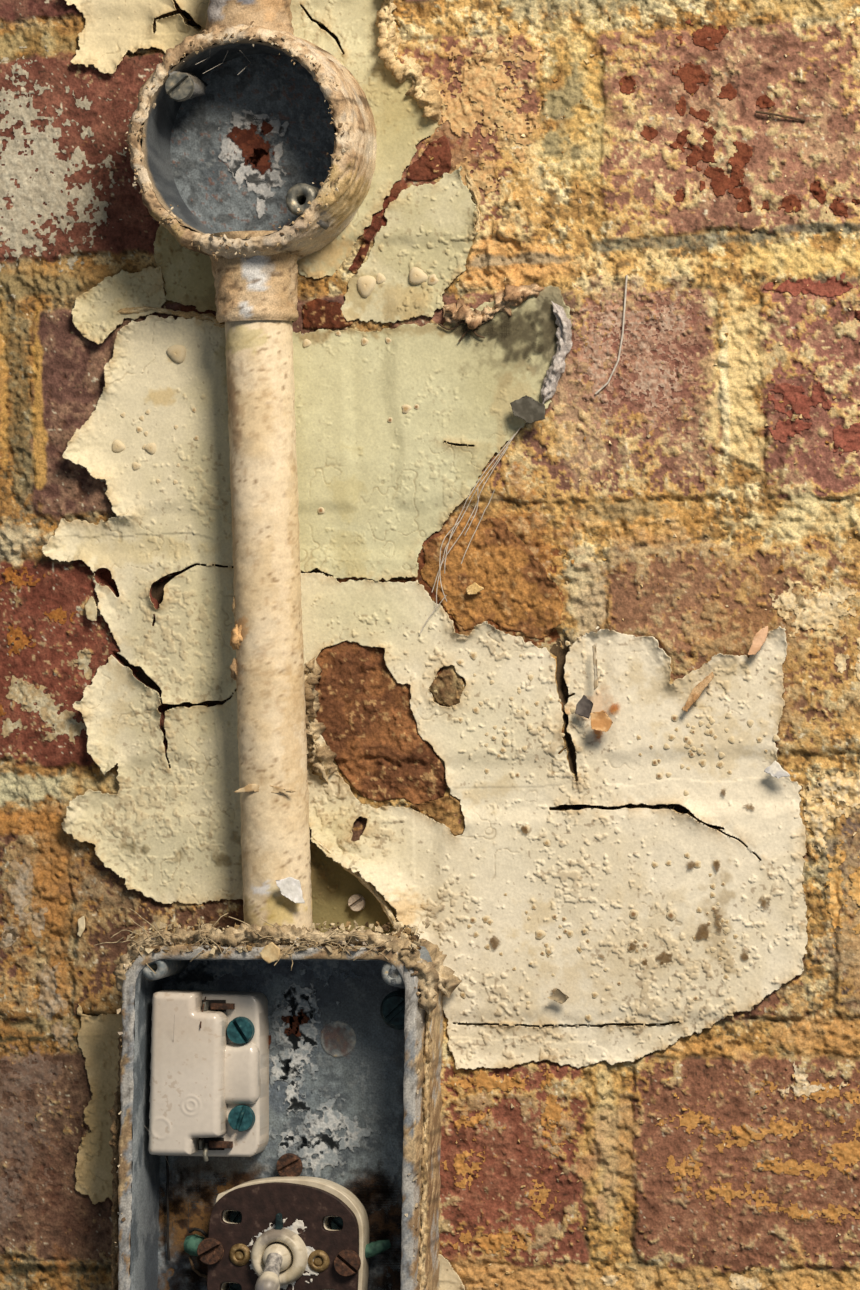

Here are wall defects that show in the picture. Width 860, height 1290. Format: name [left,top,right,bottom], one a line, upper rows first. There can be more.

crack [161,4,201,27]
spalling [640,62,860,218]
crack [100,570,119,593]
crack [151,563,234,604]
crack [310,568,333,576]
peeling [42,0,808,1070]
crack [116,654,231,759]
crack [550,638,757,855]
peeling [75,1004,123,1205]